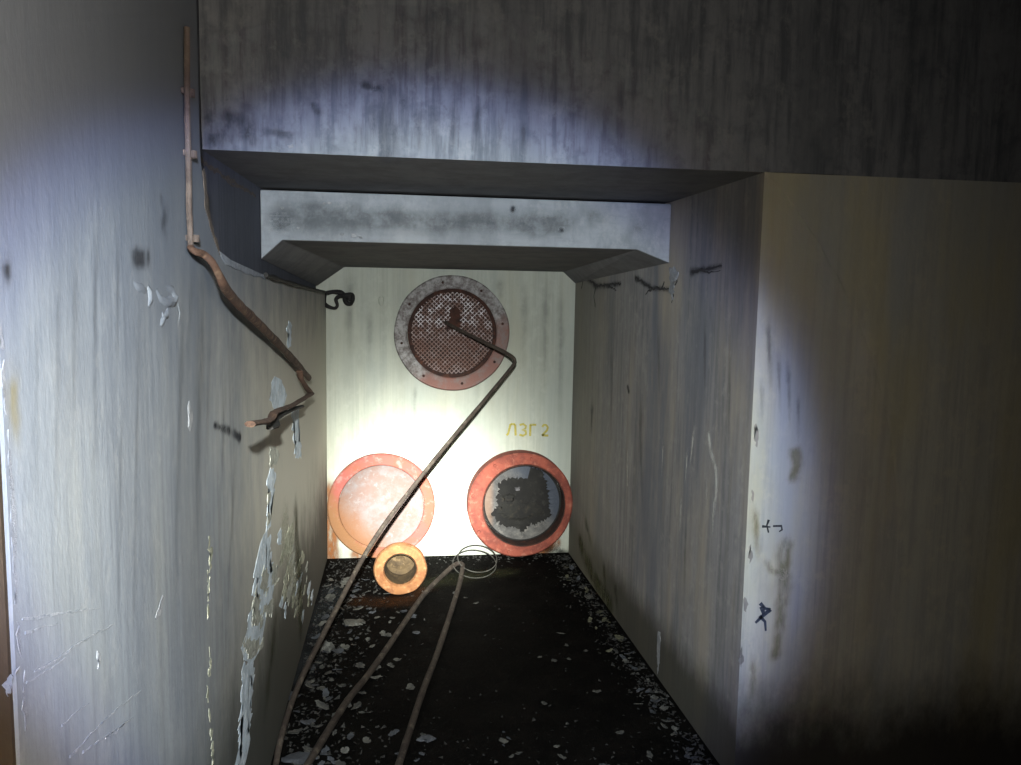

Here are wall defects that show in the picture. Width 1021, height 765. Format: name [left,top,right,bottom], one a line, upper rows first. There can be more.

peeling [269,376,302,459]
peeling [235,447,318,765]